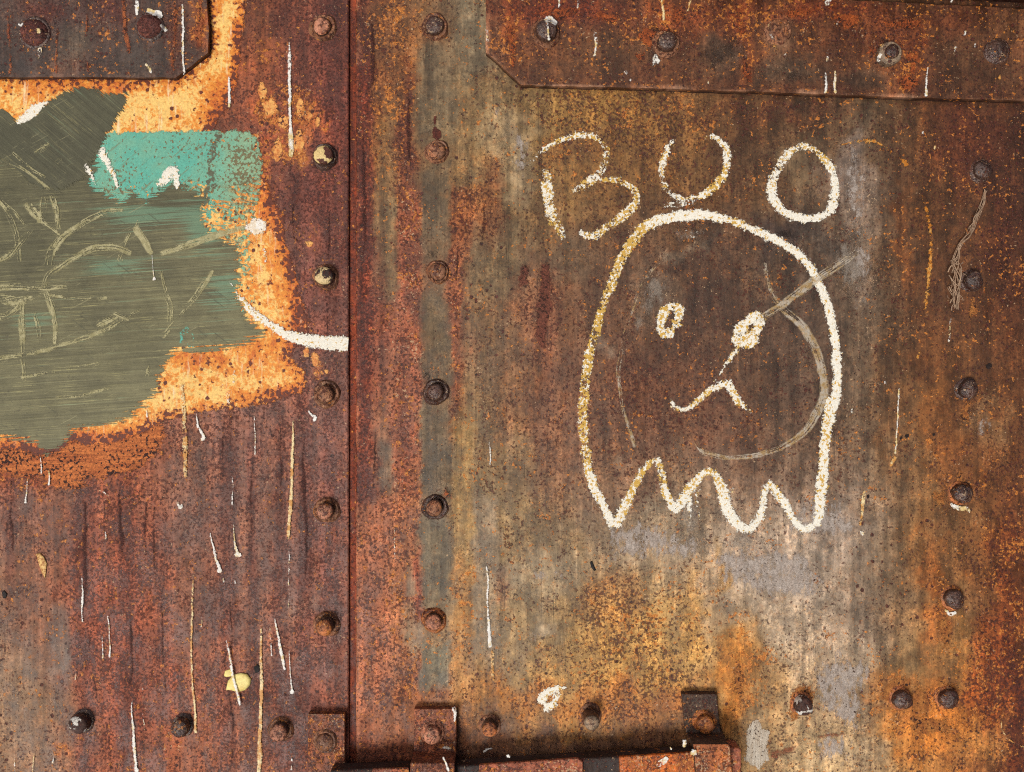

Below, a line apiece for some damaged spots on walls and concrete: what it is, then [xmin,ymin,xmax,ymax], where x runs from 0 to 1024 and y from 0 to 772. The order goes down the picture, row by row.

corrosion [535,7,631,23]
peeling [0,0,246,143]
corrosion [432,116,442,140]
peeling [0,82,328,456]
corrosion [924,206,933,309]
corrosion [0,421,166,551]
corrosion [733,653,745,703]
corrosion [880,675,963,738]